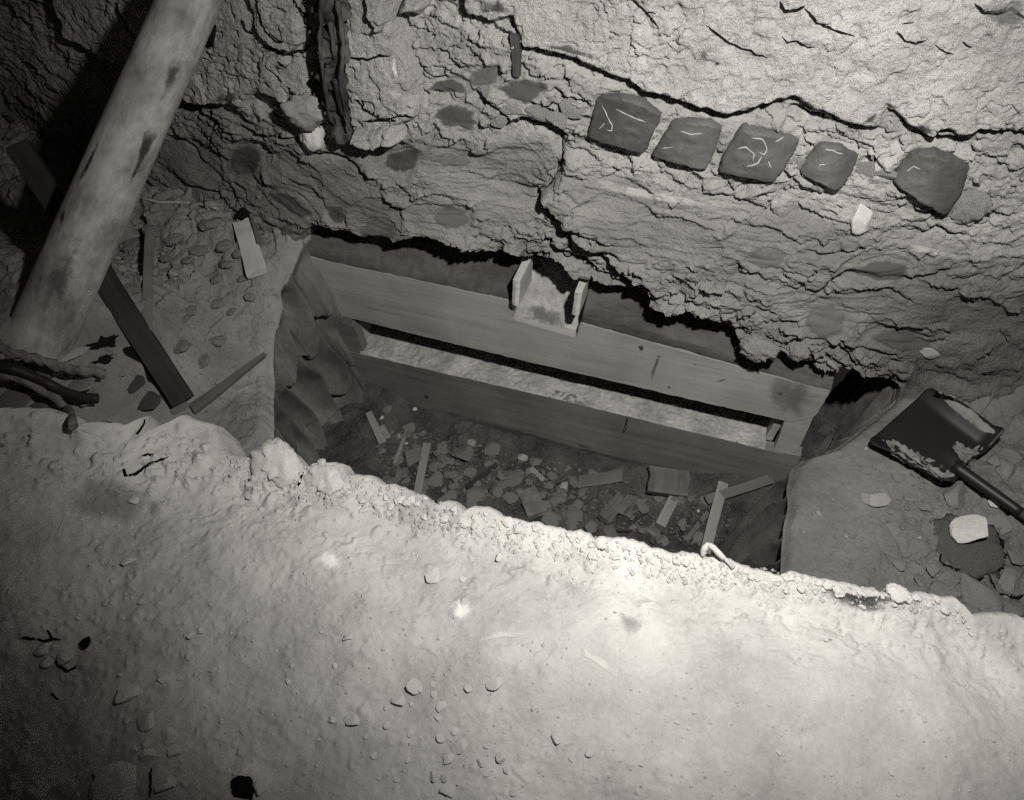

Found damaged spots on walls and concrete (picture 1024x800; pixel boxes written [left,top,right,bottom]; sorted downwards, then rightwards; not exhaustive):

crack [708,1,854,58]
crack [897,22,972,54]
crack [974,3,1024,18]
crack [354,99,414,123]
crack [479,92,582,192]
crack [524,237,624,281]